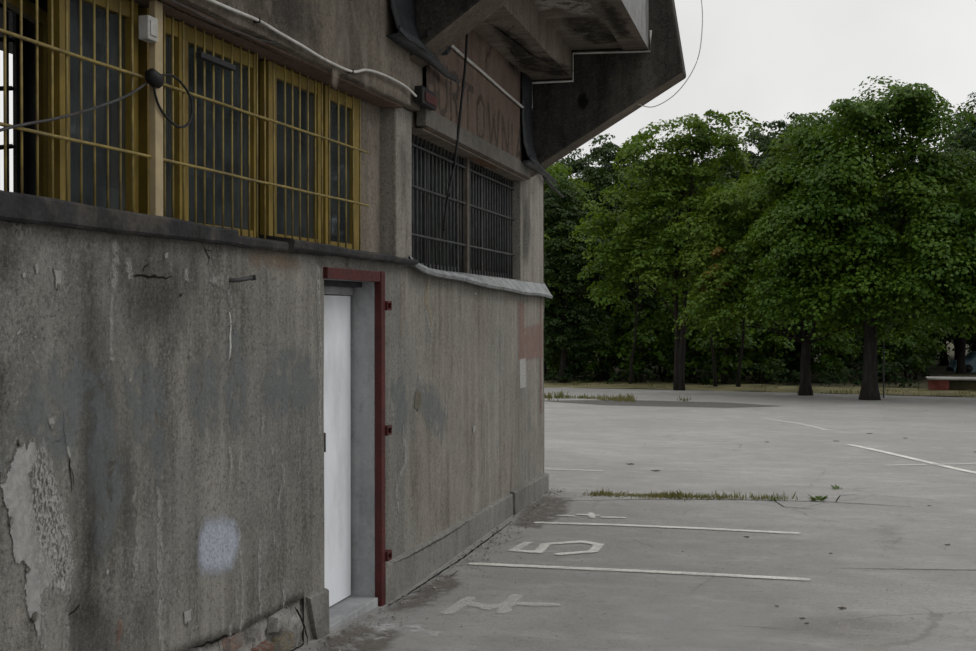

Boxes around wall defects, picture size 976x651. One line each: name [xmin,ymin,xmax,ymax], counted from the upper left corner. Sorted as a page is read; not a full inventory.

water stain [536,0,629,43]
crack [130,264,172,279]
peeling [0,438,72,649]